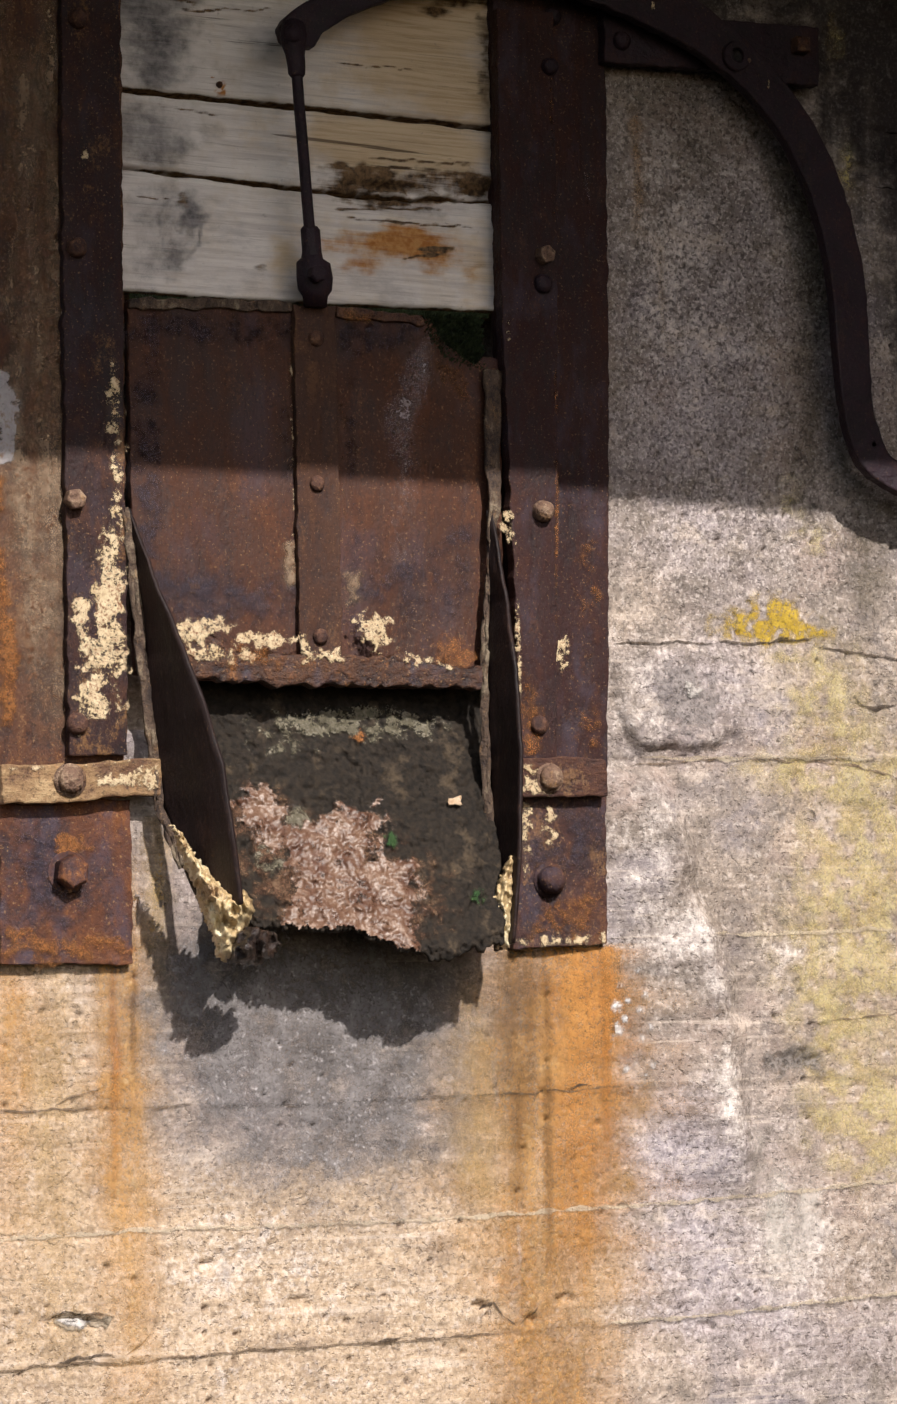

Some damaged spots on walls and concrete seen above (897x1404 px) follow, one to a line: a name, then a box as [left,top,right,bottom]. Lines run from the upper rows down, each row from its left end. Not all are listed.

crack [615,637,897,661]
crack [854,696,897,711]
peeling [230,781,427,951]
corrosion [98,943,148,1277]
leakage [137,925,454,1188]
corrosion [469,945,622,1404]
leakage [612,970,652,1042]